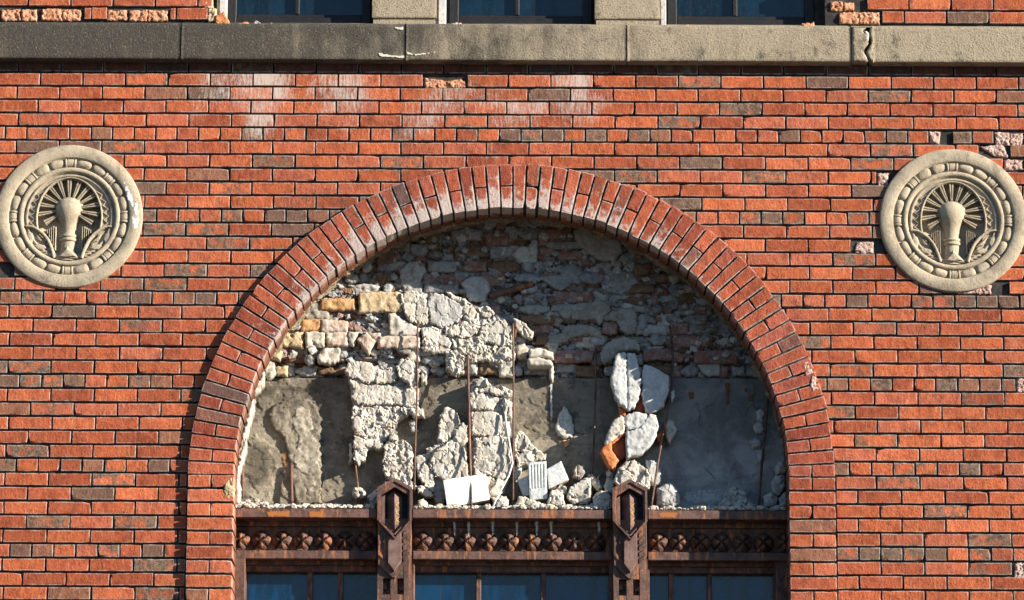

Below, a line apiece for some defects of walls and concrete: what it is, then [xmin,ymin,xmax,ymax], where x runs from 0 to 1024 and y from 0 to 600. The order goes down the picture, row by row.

spalling [1,8,81,22]
spalling [107,10,168,22]
crack [863,28,871,61]
water stain [240,74,290,136]
water stain [313,74,363,110]
water stain [556,75,590,111]
spalling [981,132,1023,171]
spalling [400,289,534,378]
peeling [600,337,677,461]
peeling [224,372,266,504]
peeling [269,399,323,505]
spalling [345,357,546,506]